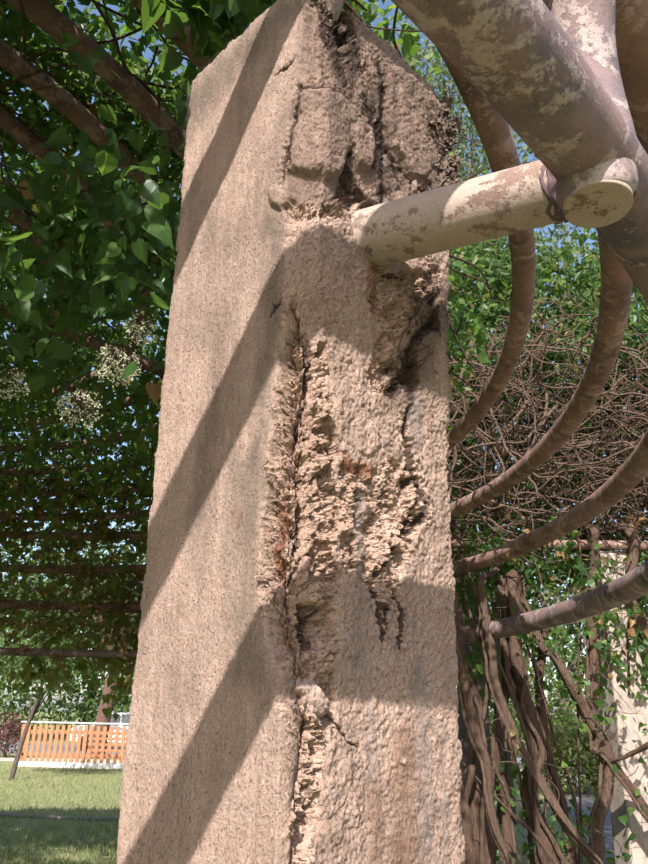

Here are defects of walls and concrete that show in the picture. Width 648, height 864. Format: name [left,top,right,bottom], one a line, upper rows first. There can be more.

crack [274,60,320,184]
spalling [332,14,359,80]
crack [332,28,422,204]
crack [371,266,426,290]
spalling [254,188,442,864]
crack [369,401,431,650]